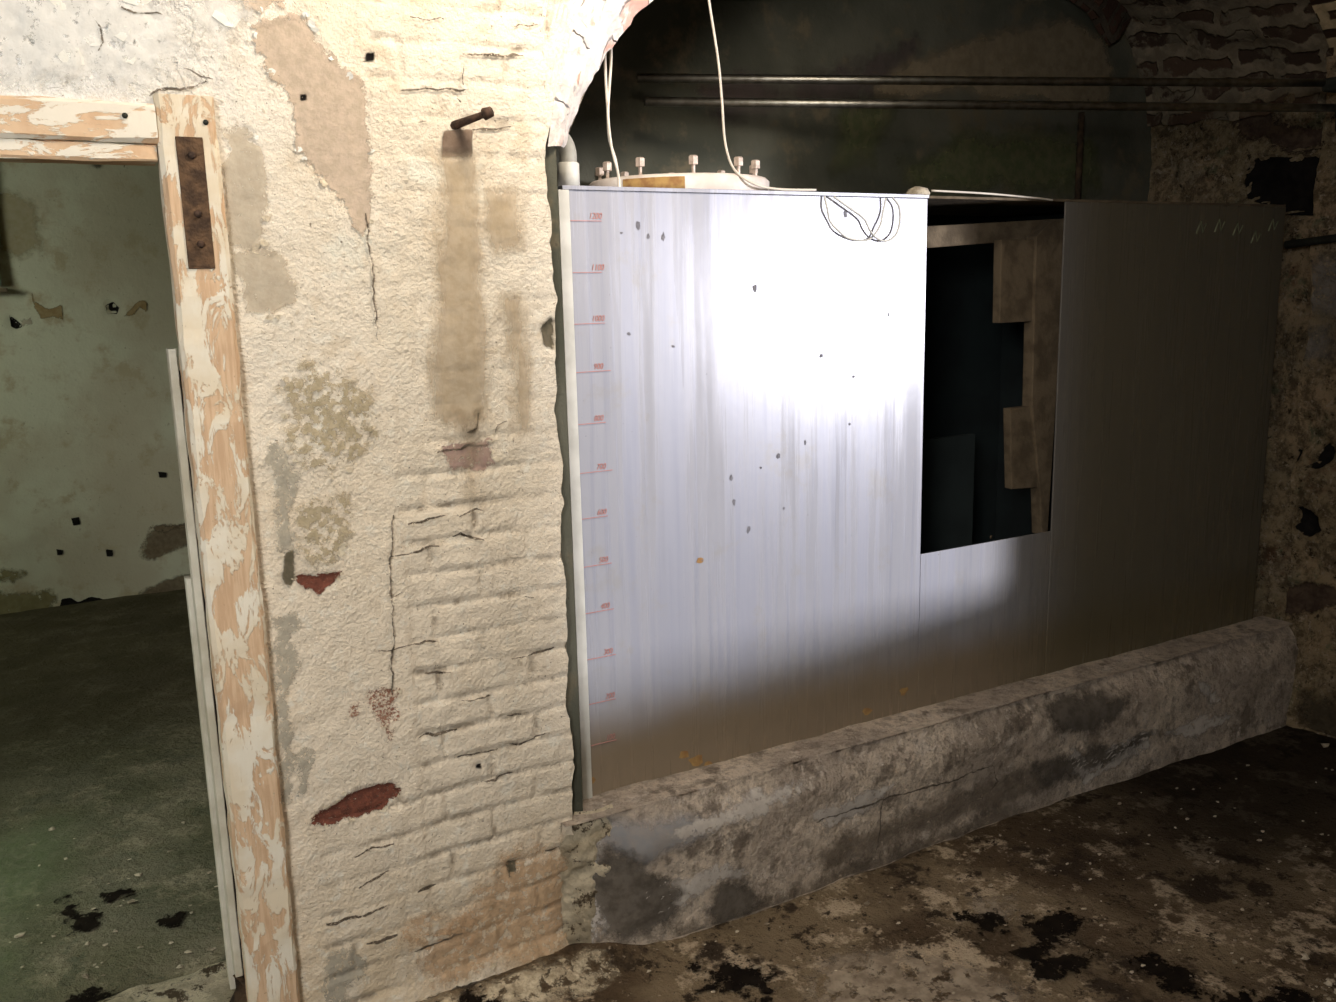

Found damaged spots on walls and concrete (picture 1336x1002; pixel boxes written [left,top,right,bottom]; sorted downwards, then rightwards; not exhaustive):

crack [97,6,161,51]
crack [149,68,211,96]
peeling [197,0,375,237]
spalling [1232,113,1323,216]
peeling [277,360,377,479]
peeling [282,491,355,596]
crack [379,508,545,782]
spalling [310,783,401,828]
leakage [458,985,501,1002]
leakage [687,955,777,1002]
leakage [953,907,1106,982]
leakage [1128,952,1316,1002]